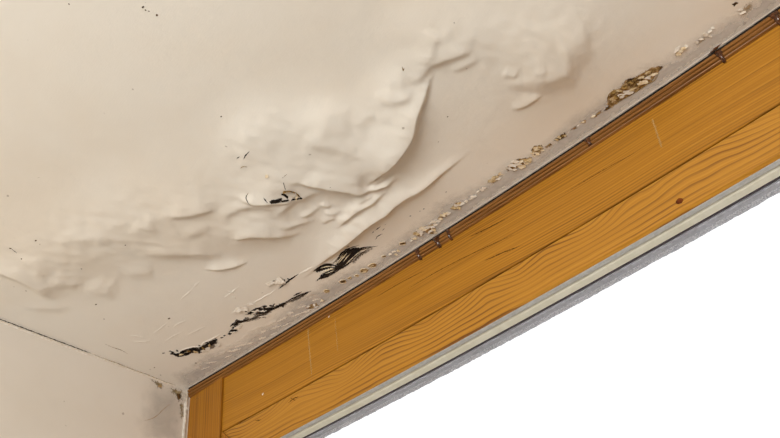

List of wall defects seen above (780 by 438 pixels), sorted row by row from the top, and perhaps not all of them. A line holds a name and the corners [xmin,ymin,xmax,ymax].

spalling [266,66,663,289]
damp [282,273,363,325]